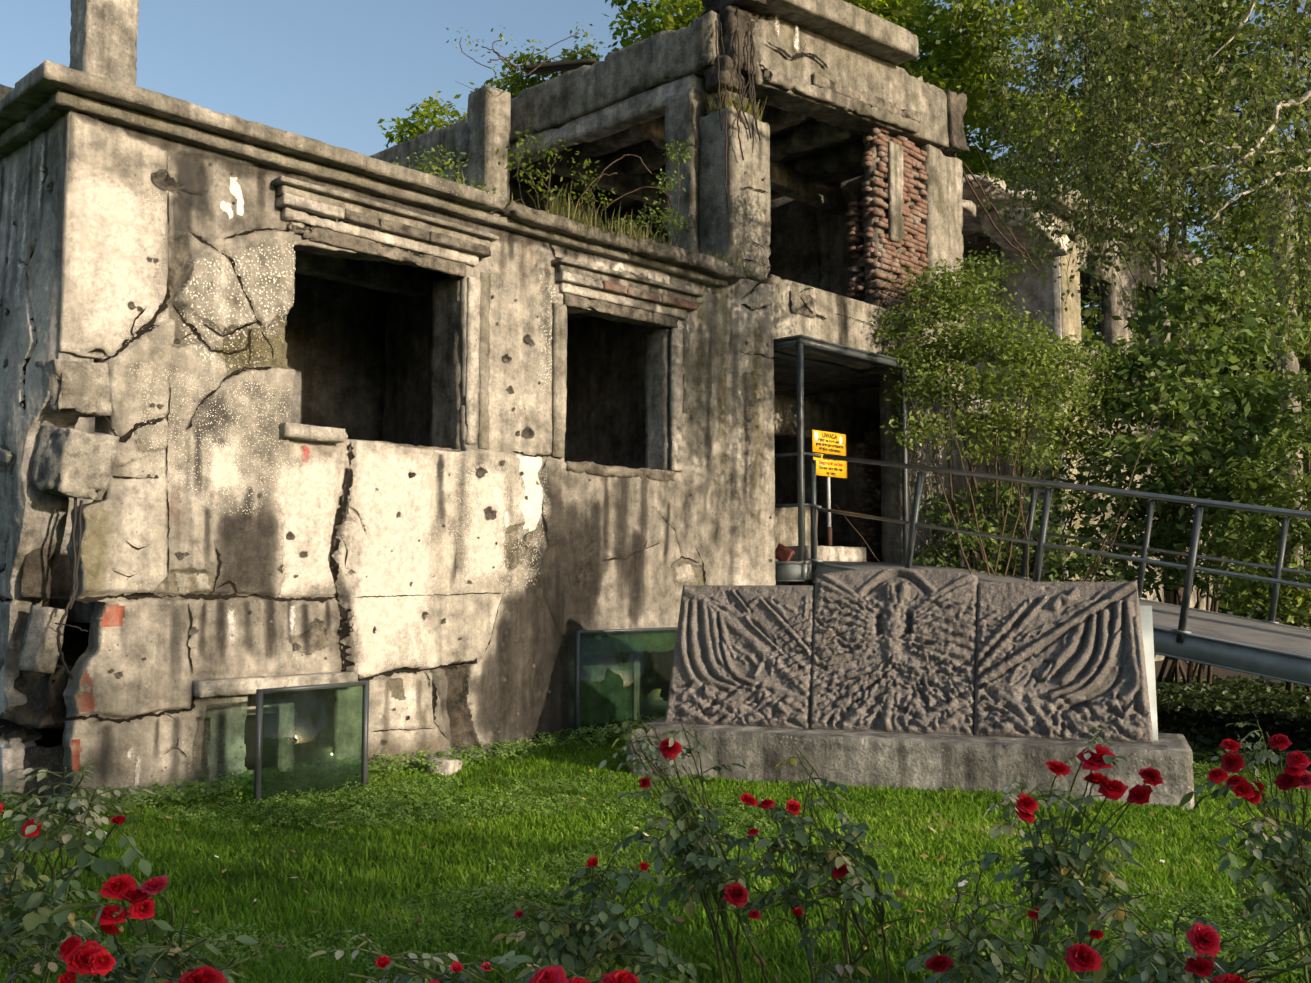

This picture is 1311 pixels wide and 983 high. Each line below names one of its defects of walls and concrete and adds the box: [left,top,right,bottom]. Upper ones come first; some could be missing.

spalling [71,739,82,772]
crack [0,163,503,756]
damp [200,488,309,657]
damp [473,469,648,757]